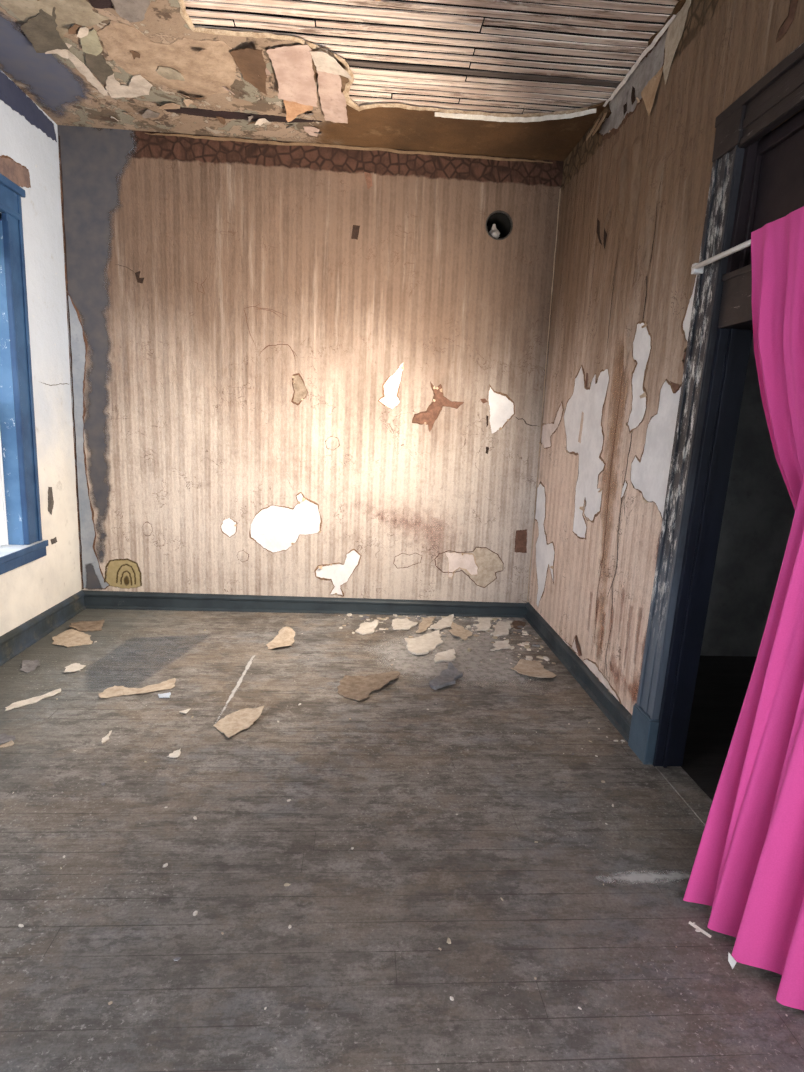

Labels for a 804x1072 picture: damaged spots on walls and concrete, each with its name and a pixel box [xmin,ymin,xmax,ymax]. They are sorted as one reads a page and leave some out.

peeling [0,0,588,118]
peeling [286,113,322,137]
flaking render [586,0,691,141]
peeling [59,153,110,589]
peeling [378,363,404,410]
peeling [488,384,515,434]
peeling [539,365,609,540]
peeling [621,321,682,519]
peeling [220,492,322,553]
peeling [314,549,362,597]
peeling [435,547,504,588]
peeling [534,481,555,607]